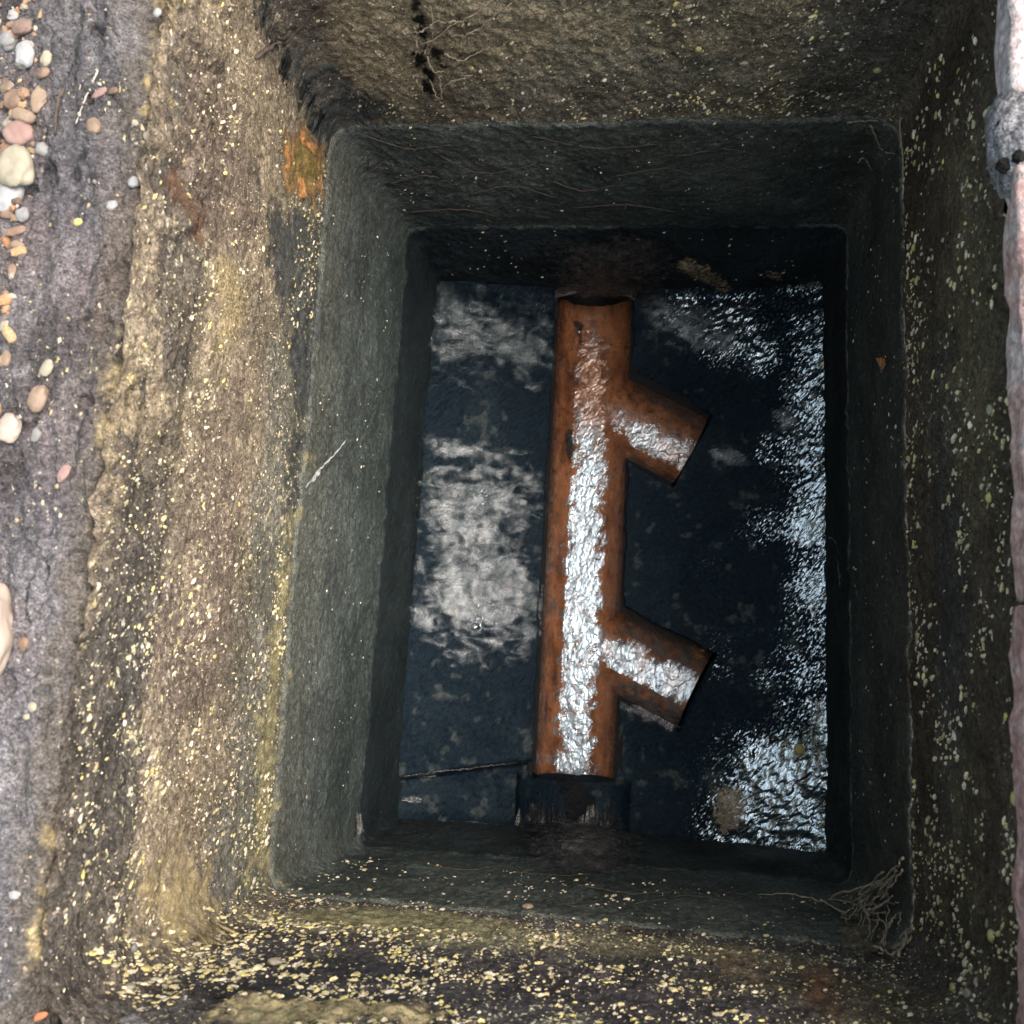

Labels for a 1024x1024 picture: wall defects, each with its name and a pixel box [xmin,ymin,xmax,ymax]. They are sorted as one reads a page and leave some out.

crack [411,0,512,105]
corrosion [283,115,327,211]
leakage [431,298,553,378]
leakage [646,306,733,352]
leakage [427,439,537,646]
leakage [416,610,432,631]
leakage [627,702,675,731]
leakage [405,762,517,779]
leakage [714,787,750,835]